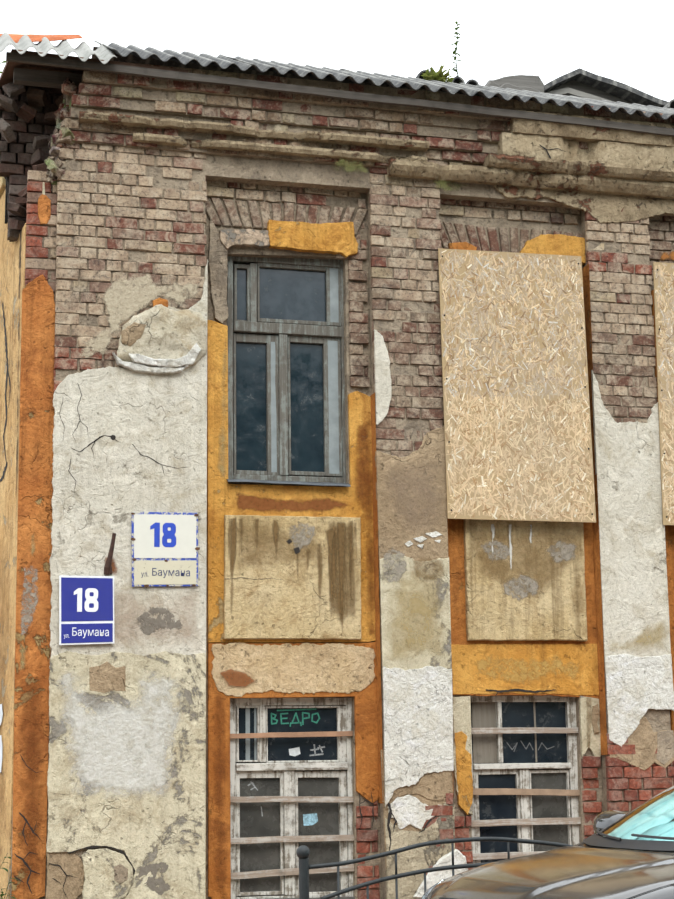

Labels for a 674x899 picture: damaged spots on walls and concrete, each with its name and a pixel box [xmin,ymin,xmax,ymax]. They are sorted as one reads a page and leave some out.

flaking render [25,142,674,458]
crack [59,383,185,489]
damp [357,426,371,507]
damp [228,493,346,572]
damp [292,522,355,619]
damp [478,524,575,600]
flaking render [581,704,674,839]
flaking render [356,771,473,899]